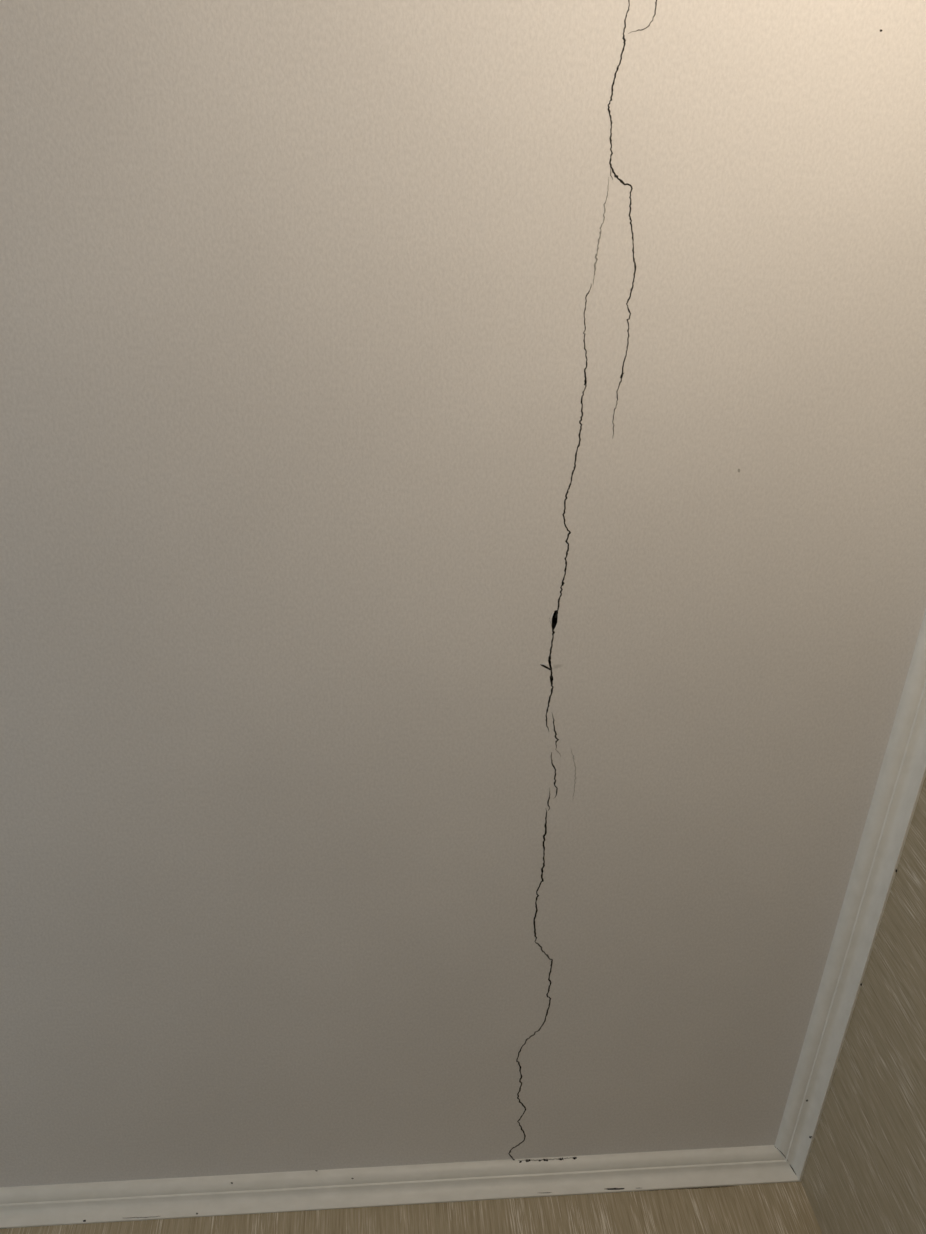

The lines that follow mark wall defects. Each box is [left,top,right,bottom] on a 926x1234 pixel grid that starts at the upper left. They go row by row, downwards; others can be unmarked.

crack [509,0,657,1163]